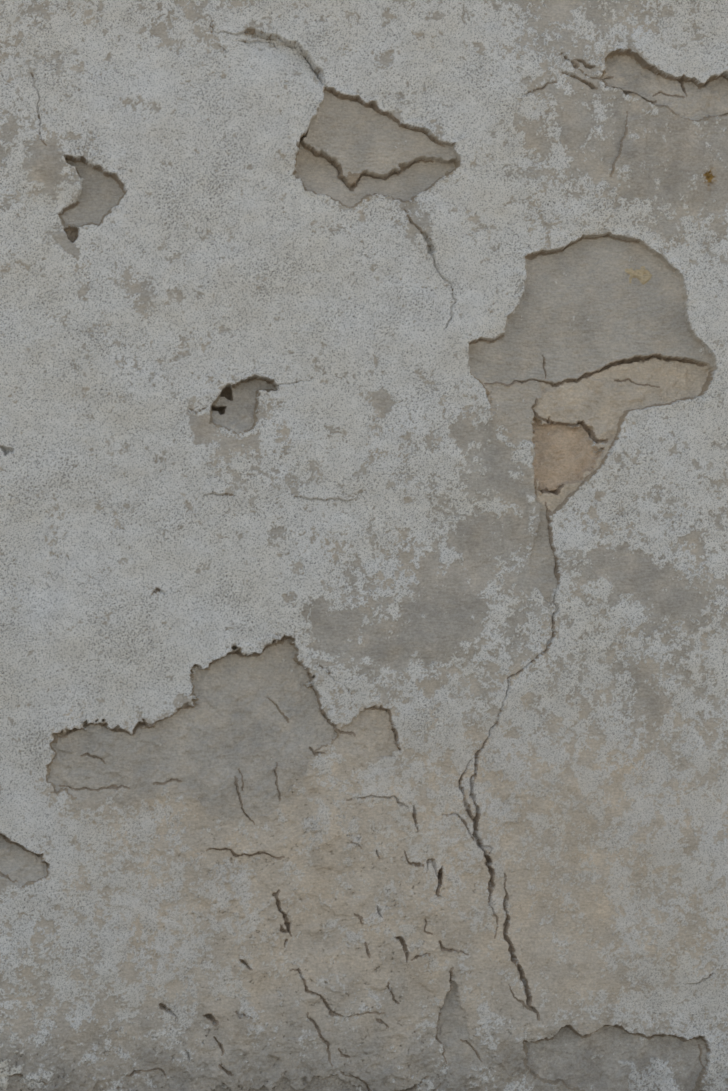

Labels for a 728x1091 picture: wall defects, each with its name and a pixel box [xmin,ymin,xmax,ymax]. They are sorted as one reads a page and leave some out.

spalling [51,154,127,262]
spalling [293,87,462,209]
peeling [601,47,728,215]
crack [403,209,457,330]
spalling [189,375,313,435]
spalling [449,232,718,517]
crack [293,495,361,503]
spalling [46,504,531,823]
crack [202,762,289,860]
crack [346,494,561,1021]
crack [273,890,400,1067]
spalling [522,1024,712,1091]